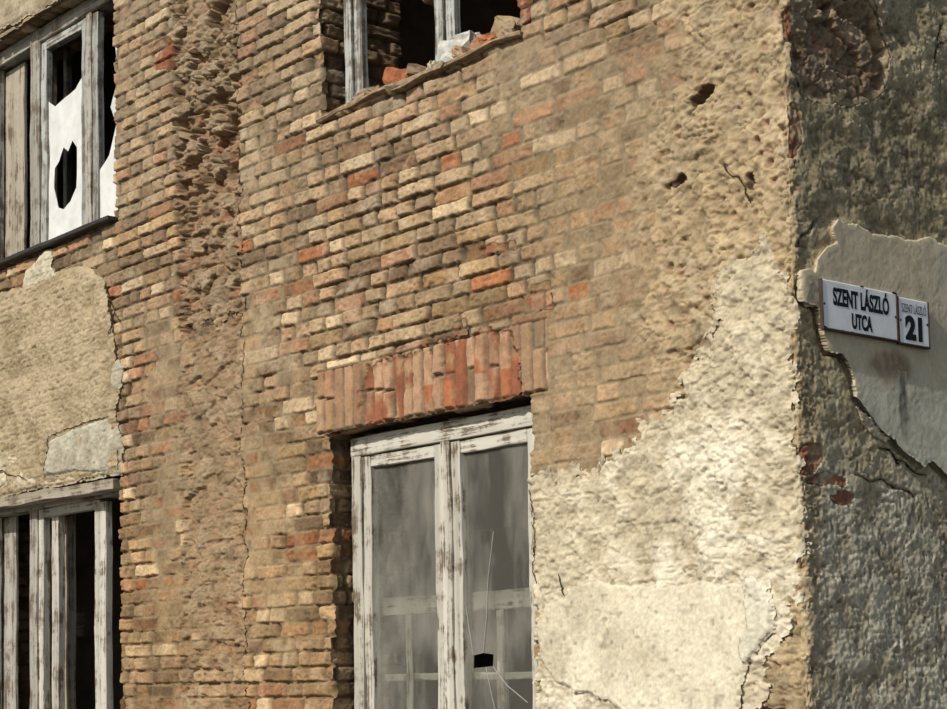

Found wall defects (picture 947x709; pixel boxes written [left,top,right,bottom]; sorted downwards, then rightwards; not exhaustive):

spalling [783,0,890,159]
crack [934,25,944,63]
flaking render [527,219,947,709]
crack [855,448,927,497]